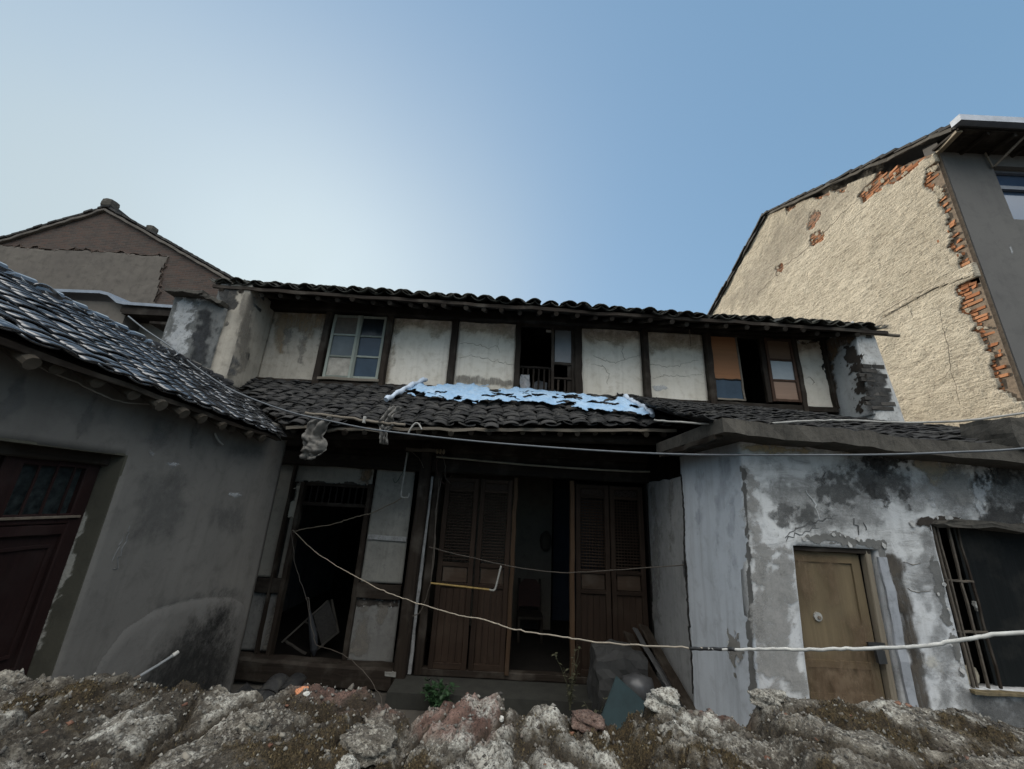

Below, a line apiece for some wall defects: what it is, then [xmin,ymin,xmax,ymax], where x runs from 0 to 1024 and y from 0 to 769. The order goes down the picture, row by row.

spalling [806,186,847,246]
spalling [859,154,1023,402]
spalling [840,346,896,414]
peeling [973,466,991,514]
flaking render [909,514,961,531]